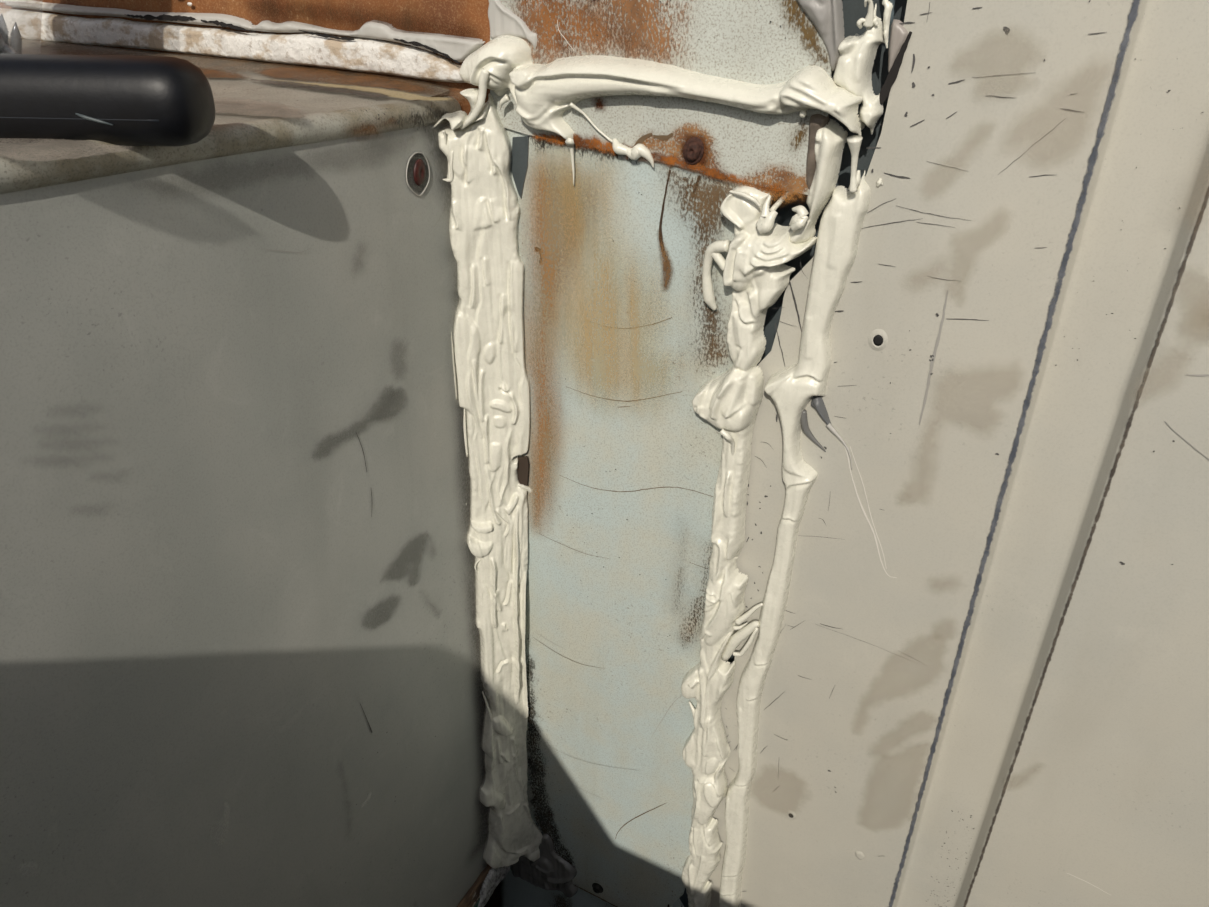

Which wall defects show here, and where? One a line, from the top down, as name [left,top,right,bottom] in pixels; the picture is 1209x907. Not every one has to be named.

rust [255,0,433,31]
rust [515,0,686,64]
rust [780,0,829,68]
rust [791,116,807,148]
rust [535,123,808,367]
rust [532,169,585,523]